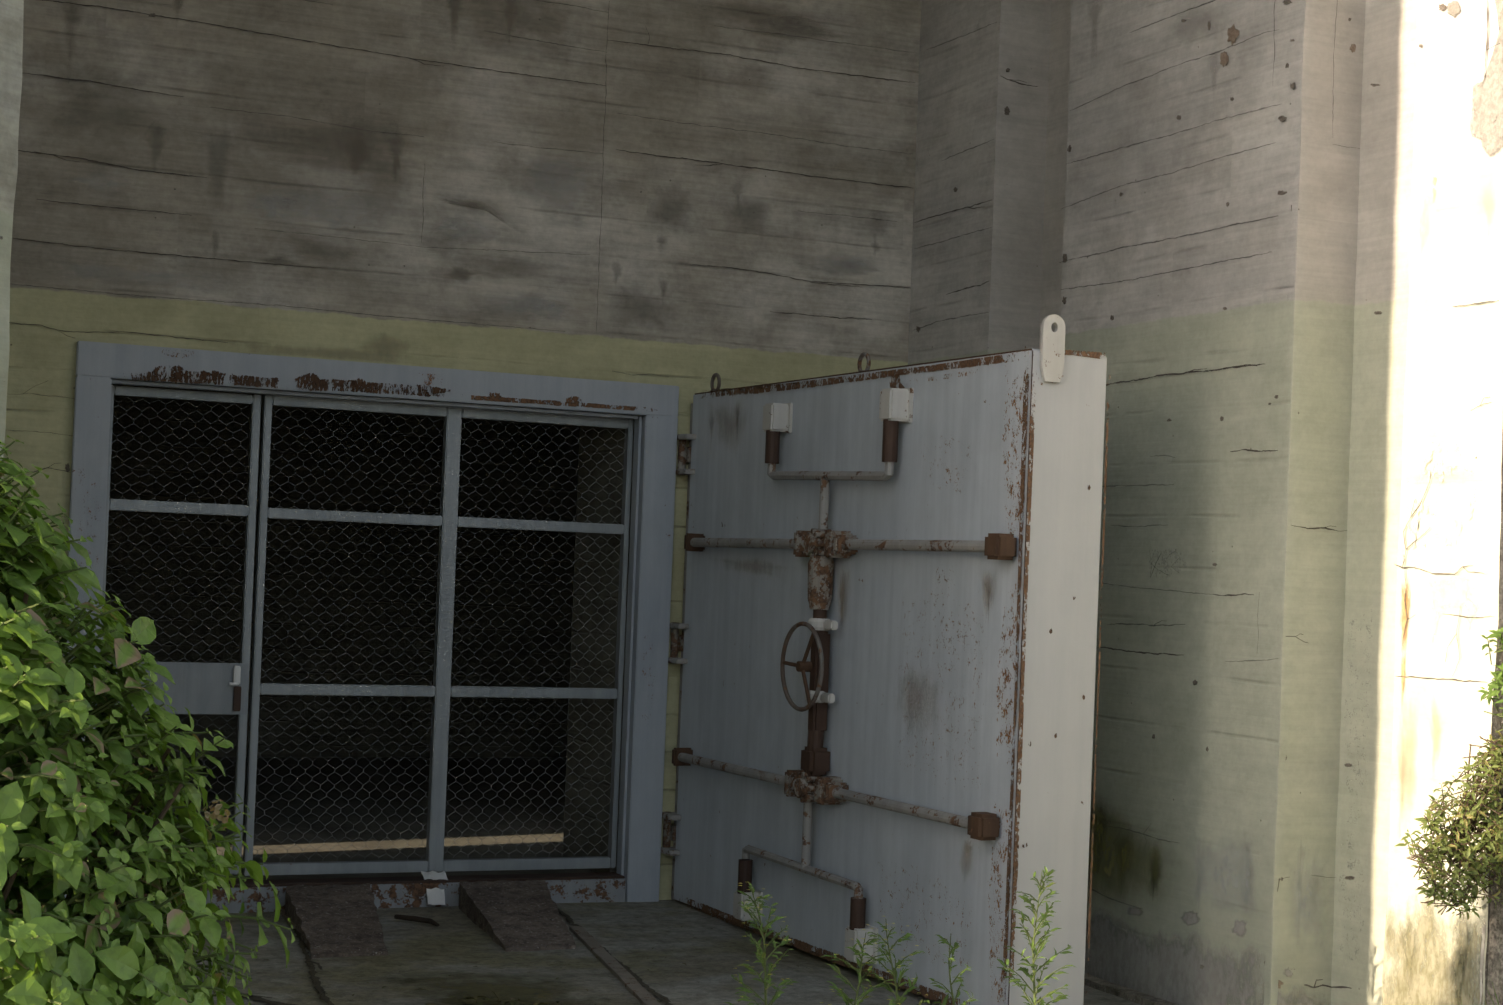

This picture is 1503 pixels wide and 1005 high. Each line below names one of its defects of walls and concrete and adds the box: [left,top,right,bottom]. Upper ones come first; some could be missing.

spalling [1470,0,1503,156]
rust [123,349,451,397]
rust [471,393,653,412]
rust [674,346,1036,1005]
rust [1401,587,1410,693]